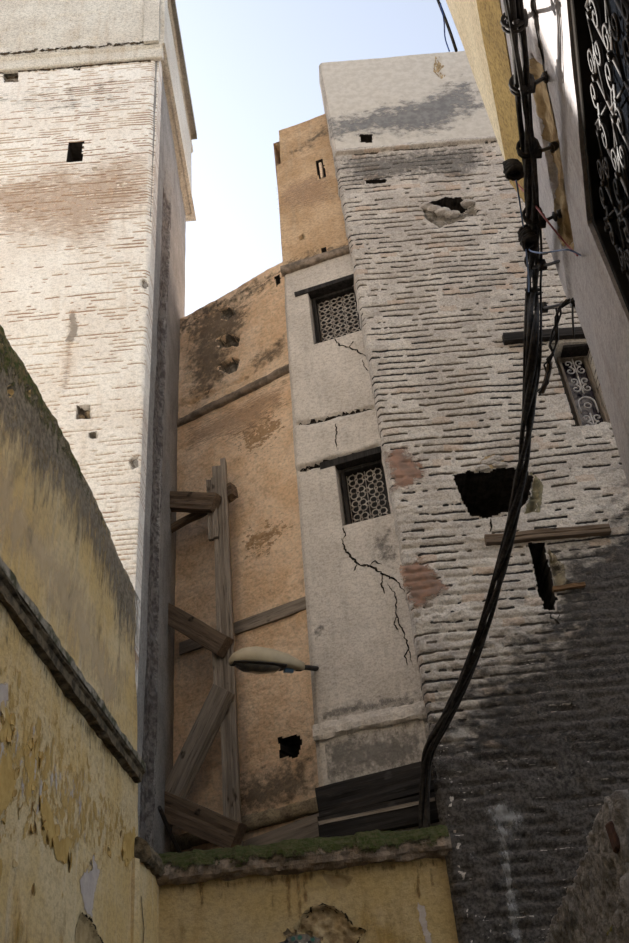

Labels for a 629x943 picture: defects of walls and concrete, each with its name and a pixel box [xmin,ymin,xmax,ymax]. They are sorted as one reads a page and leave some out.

leakage [291,82,483,153]
spalling [419,198,477,228]
leakage [65,313,78,341]
crack [335,339,368,371]
leakage [0,336,140,649]
spalling [524,472,543,514]
flaking render [0,187,171,943]
crack [342,528,413,665]
leakage [488,804,524,943]
spalling [275,903,366,943]